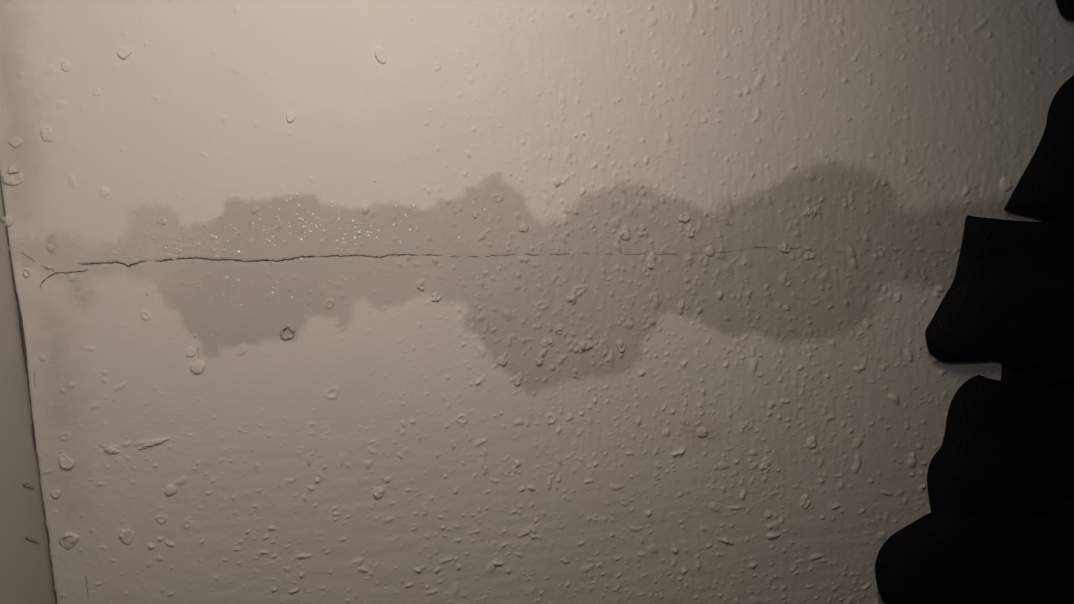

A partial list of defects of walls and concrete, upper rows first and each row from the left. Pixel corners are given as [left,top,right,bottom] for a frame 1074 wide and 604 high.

crack [0,174,812,384]
leakage [108,162,1023,392]